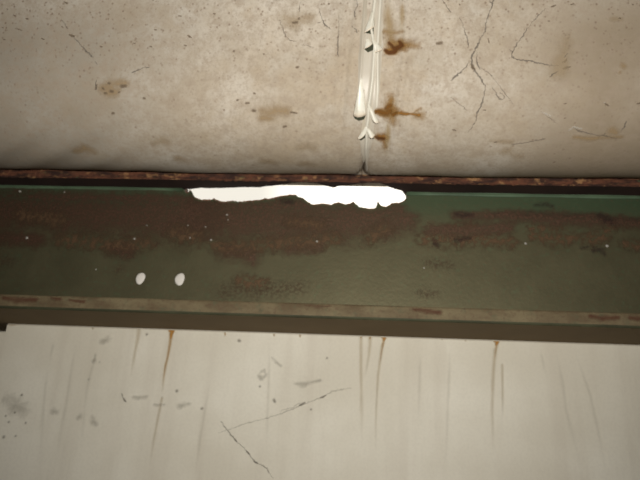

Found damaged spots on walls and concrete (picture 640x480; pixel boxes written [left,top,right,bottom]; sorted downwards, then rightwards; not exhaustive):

rust [383,31,417,55]
crack [449,10,511,117]
rust [374,96,422,124]
rust [186,190,418,265]